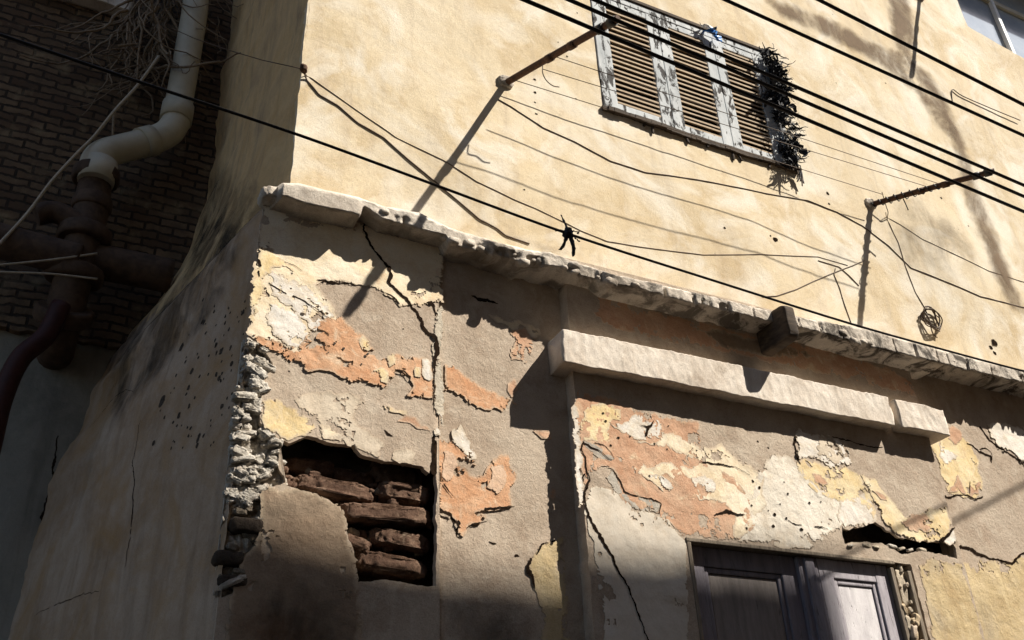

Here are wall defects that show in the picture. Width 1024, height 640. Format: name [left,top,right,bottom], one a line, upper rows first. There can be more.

peeling [158,206,518,598]
crack [363,224,440,410]
flaking render [488,314,541,363]
crack [581,441,662,640]
flaking render [571,389,957,550]
peeling [931,425,983,499]
peeling [987,422,1024,462]